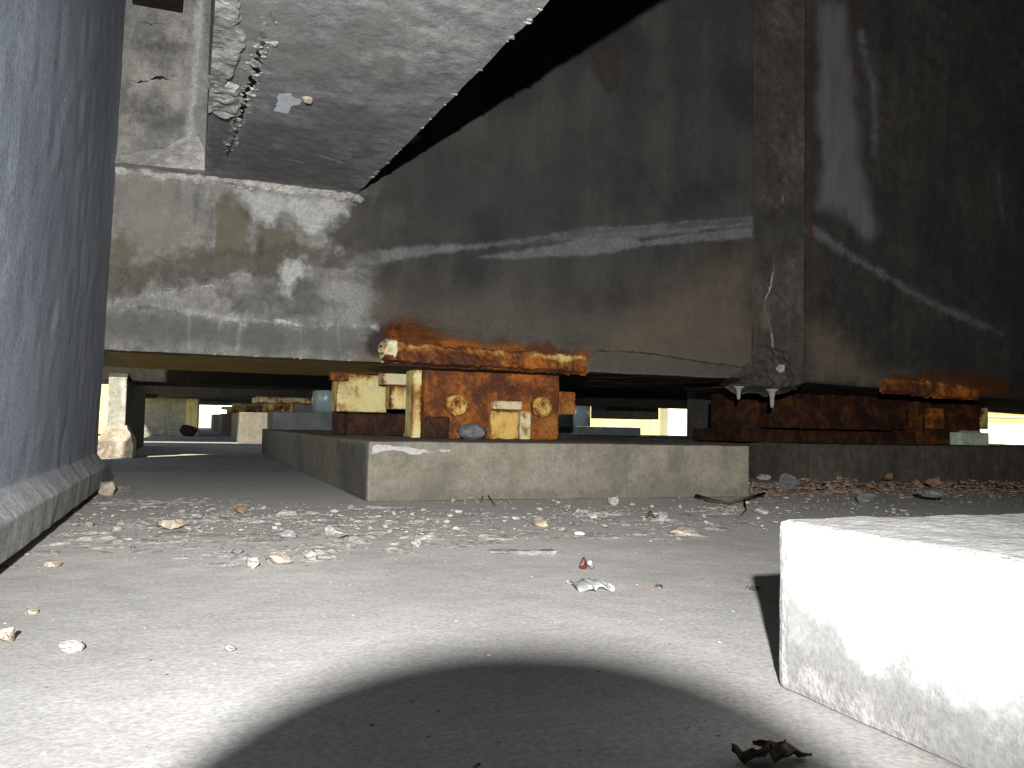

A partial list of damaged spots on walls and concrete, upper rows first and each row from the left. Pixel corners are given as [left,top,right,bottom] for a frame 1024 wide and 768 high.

crack [132,75,169,83]
spalling [206,0,247,119]
damp [815,0,877,245]
damp [107,183,753,376]
corrosion [381,320,591,360]
damp [520,267,805,408]
crack [758,255,777,347]
damp [805,226,1004,336]